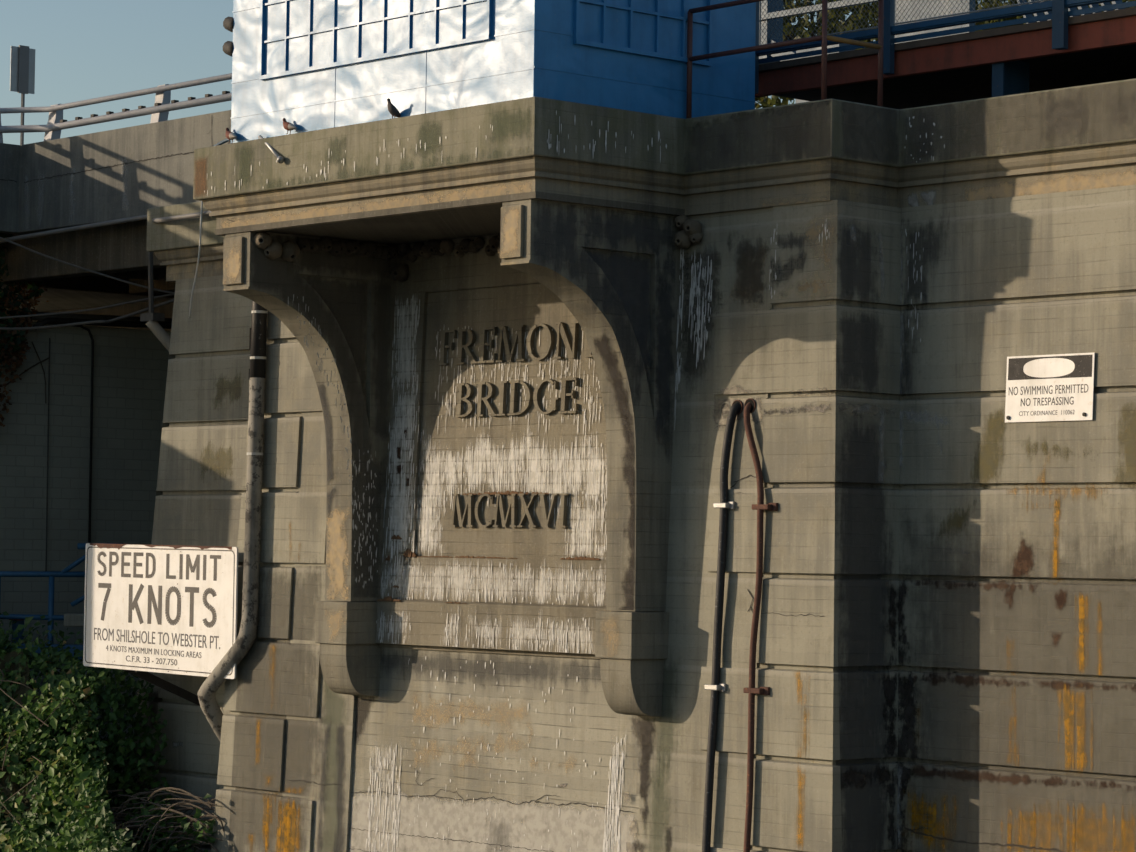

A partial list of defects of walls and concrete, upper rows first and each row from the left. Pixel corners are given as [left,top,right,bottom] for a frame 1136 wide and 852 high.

damp [222,182,531,228]
damp [769,220,878,390]
damp [224,207,712,668]
damp [974,411,1004,488]
damp [835,427,1063,852]
damp [1055,590,1067,610]
rust [1079,593,1101,671]
damp [1041,681,1136,690]
damp [317,697,654,852]
rust [262,779,301,852]